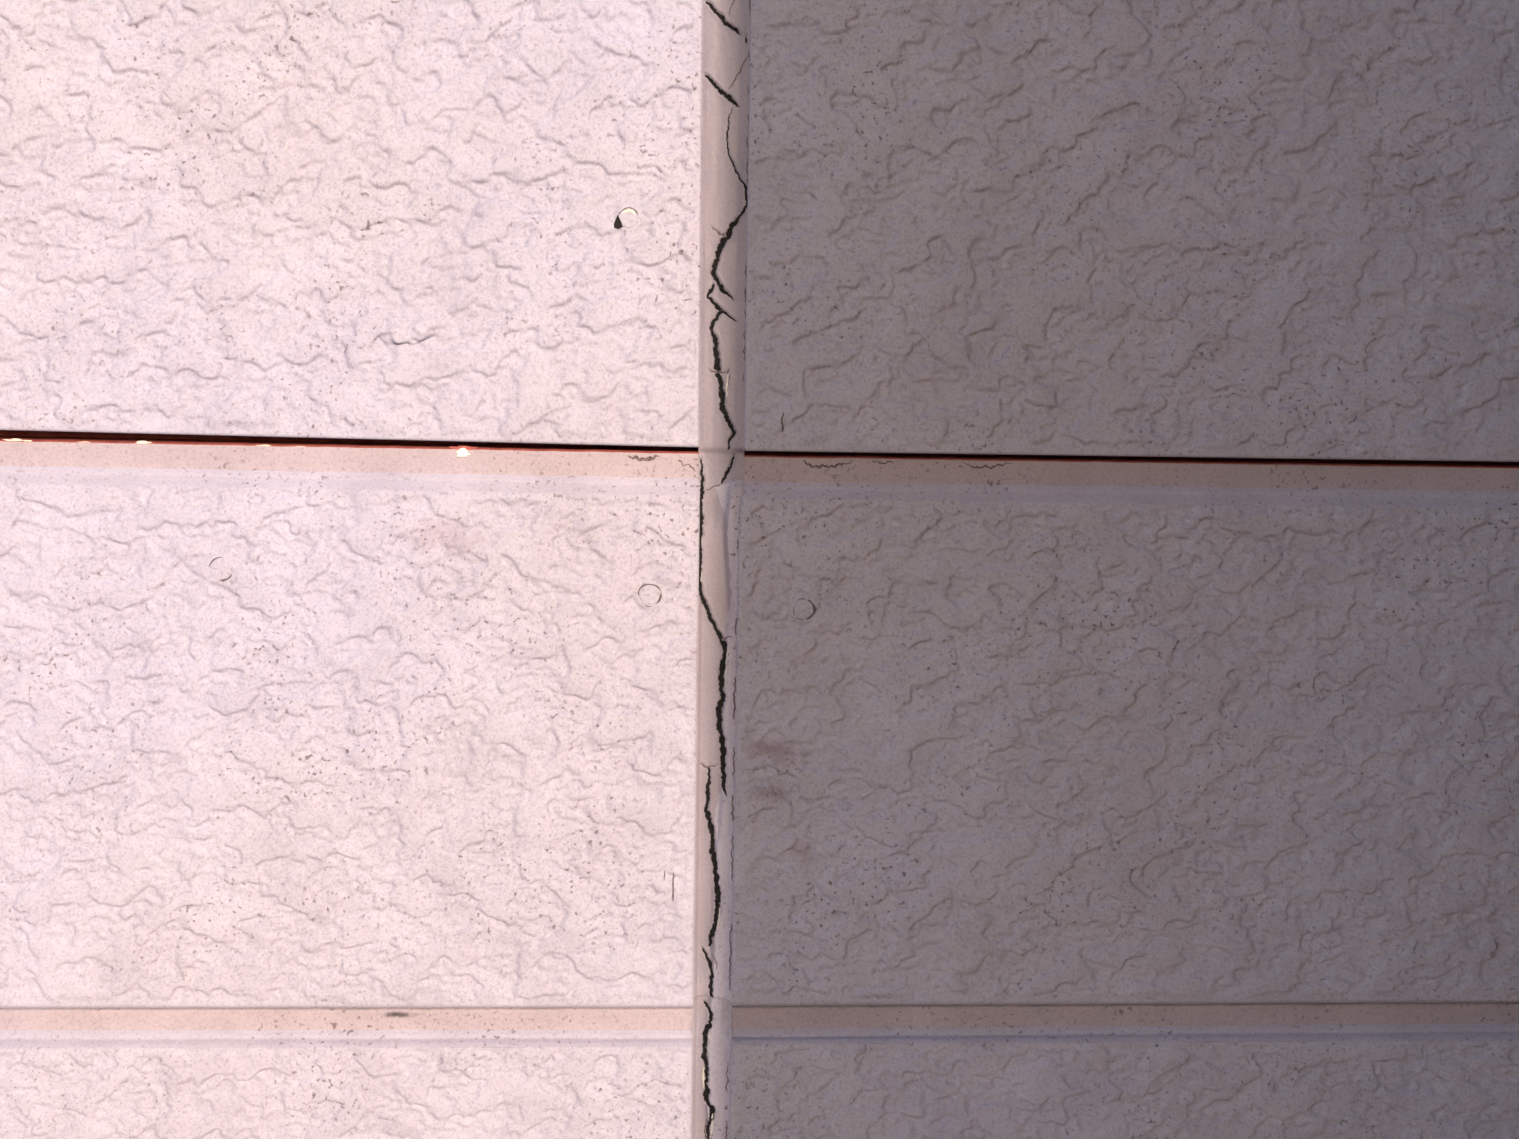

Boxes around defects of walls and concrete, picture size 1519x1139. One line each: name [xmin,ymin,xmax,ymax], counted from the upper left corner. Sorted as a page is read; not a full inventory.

crack [629,0,751,1139]
crack [781,412,895,469]